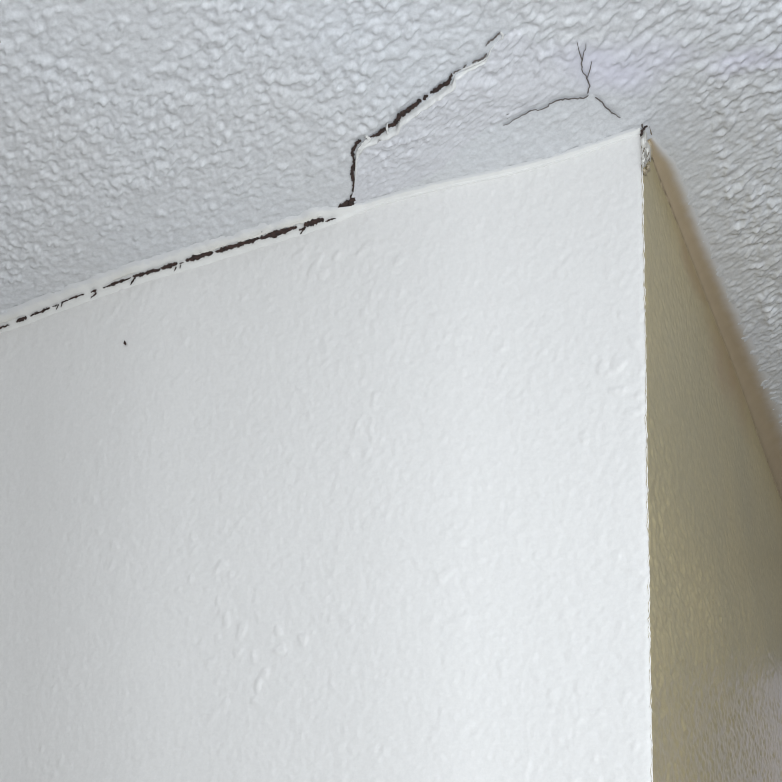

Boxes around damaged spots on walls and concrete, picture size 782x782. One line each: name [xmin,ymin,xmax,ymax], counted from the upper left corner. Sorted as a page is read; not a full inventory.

crack [0,32,504,329]
crack [503,43,621,126]